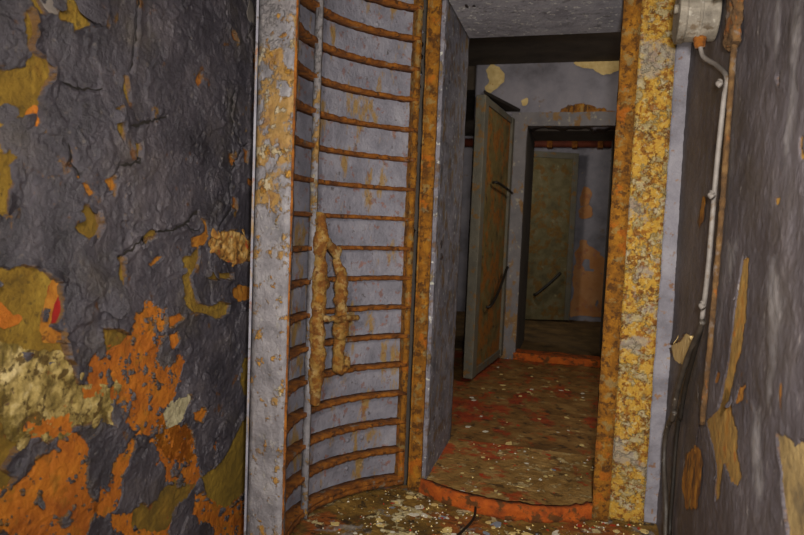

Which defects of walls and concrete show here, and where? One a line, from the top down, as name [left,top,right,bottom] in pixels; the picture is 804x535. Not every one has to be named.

peeling [0,0,111,128]
rust [561,103,615,112]
peeling [0,144,21,216]
spalling [74,176,115,247]
peeling [179,221,251,322]
spalling [0,266,248,535]
peeling [707,255,749,501]
peeling [779,434,804,535]